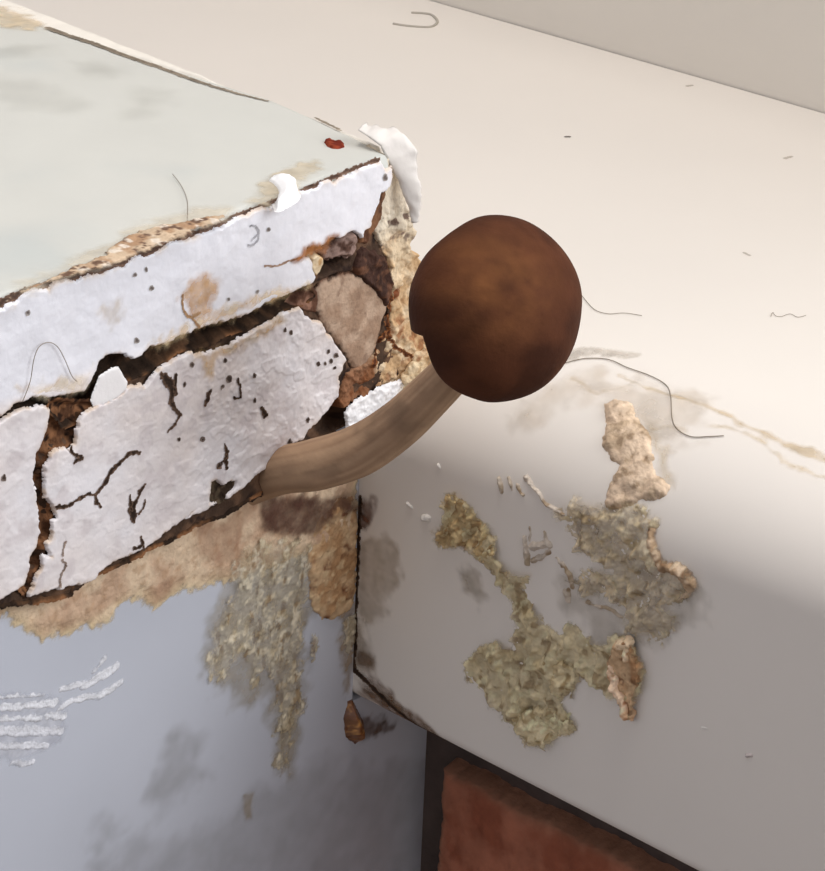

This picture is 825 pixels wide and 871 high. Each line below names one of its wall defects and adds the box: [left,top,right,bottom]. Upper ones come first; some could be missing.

peeling [20,215,224,292]
peeling [269,173,301,212]
spalling [284,122,431,408]
peeling [90,366,127,406]
crack [0,286,315,610]
peeling [0,480,358,769]
leakage [208,555,310,703]
peeling [406,474,696,751]
leakage [0,655,124,767]